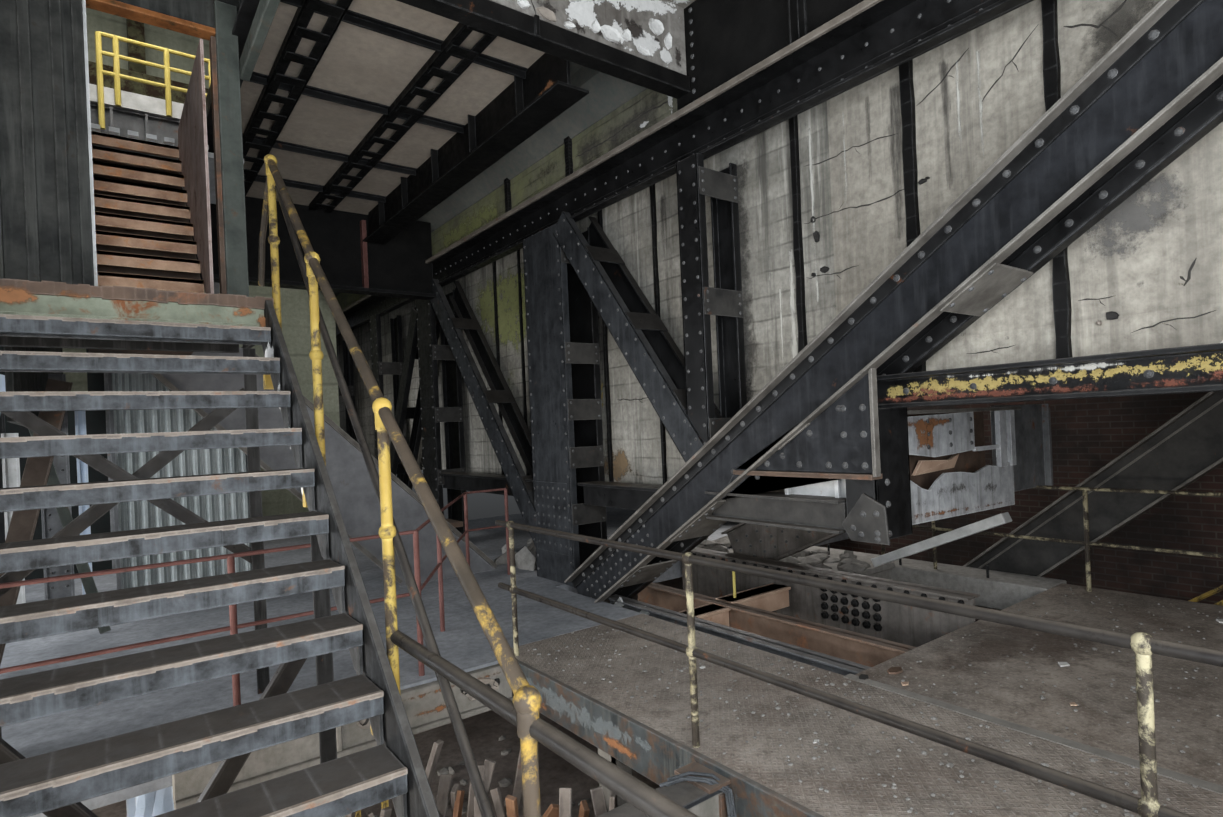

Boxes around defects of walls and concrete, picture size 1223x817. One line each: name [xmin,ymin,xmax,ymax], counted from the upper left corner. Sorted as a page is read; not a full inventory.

peeling [517,0,677,67]
crack [982,0,1127,102]
damp [1085,174,1185,256]
corrosion [0,287,38,304]
corrosion [881,353,1223,402]
corrosion [908,418,949,448]